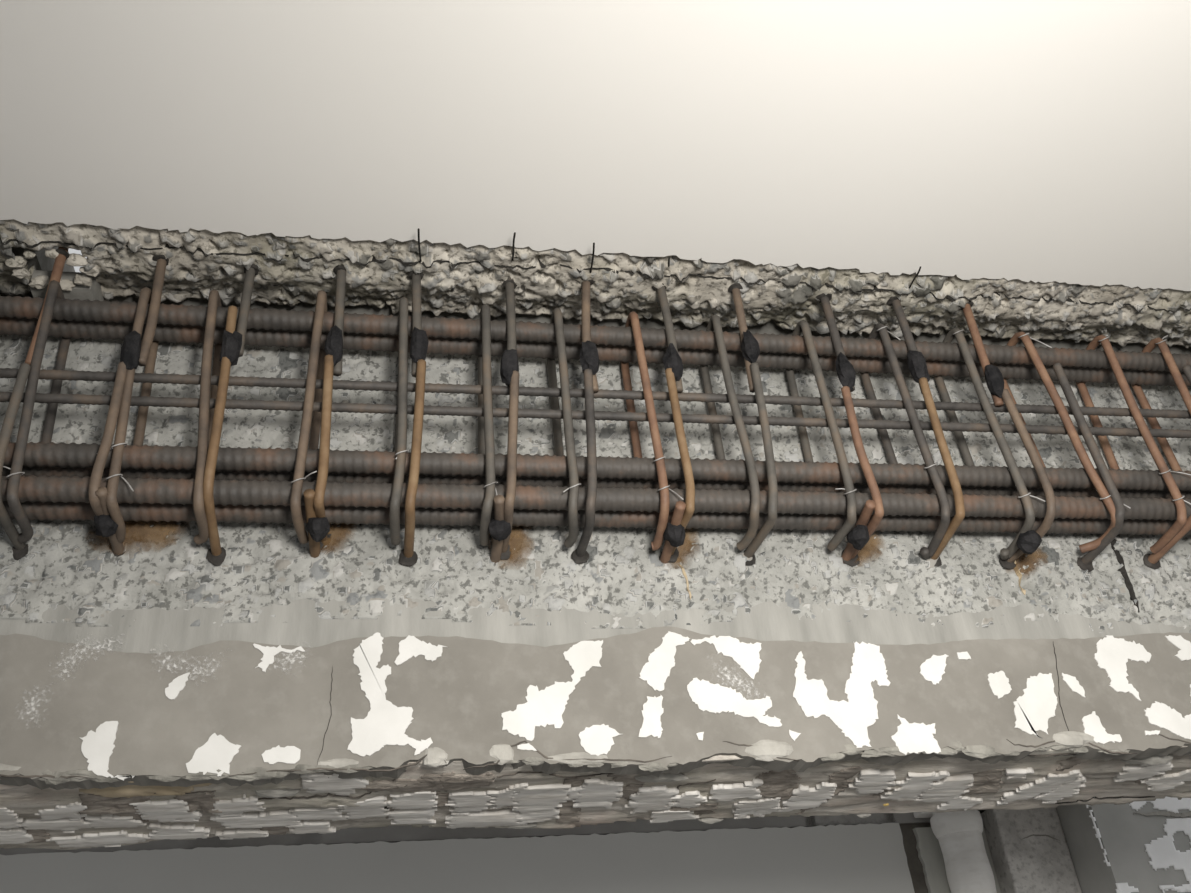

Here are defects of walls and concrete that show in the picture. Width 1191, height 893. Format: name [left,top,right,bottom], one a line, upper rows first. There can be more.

spalling [5,249,99,291]
crack [0,238,1191,313]
spalling [0,334,215,447]
spalling [219,345,1191,471]
rust [94,521,184,549]
rust [321,523,354,550]
rust [508,526,530,563]
rust [674,529,695,565]
rust [858,534,880,562]
rust [1014,551,1045,574]
crack [1111,539,1140,613]
spalling [0,519,1191,893]